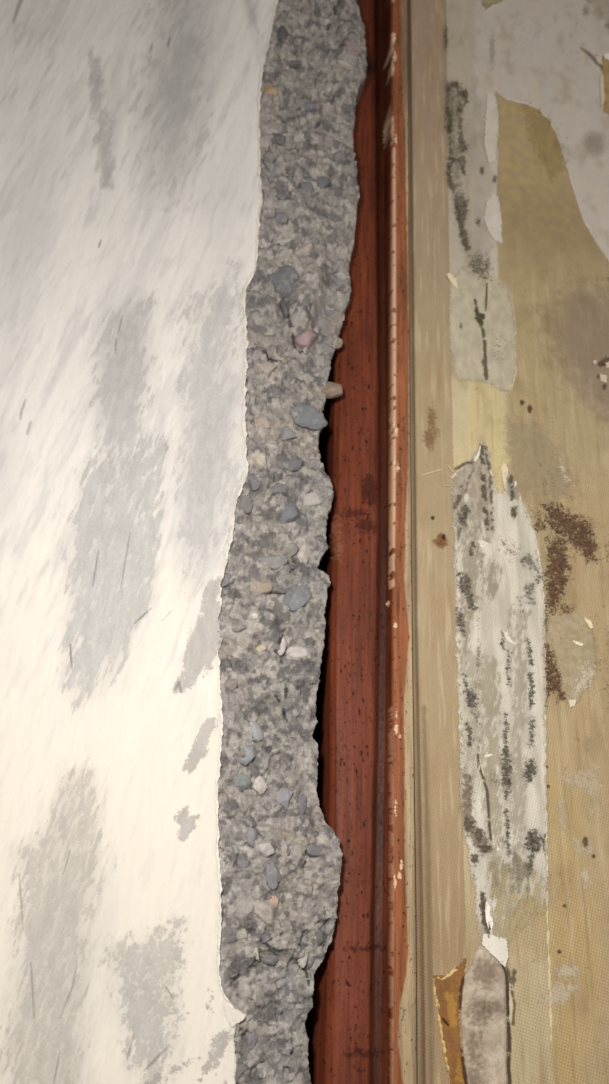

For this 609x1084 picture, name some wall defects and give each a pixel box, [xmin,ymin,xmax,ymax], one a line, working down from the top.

peeling [595,53,609,114]
peeling [484,93,609,261]
leakage [468,255,492,285]
flaking render [447,265,517,393]
spalling [593,356,609,389]
spalling [103,0,367,1084]
leakage [490,473,609,857]
flaking render [441,440,596,1084]
leakage [525,829,546,877]